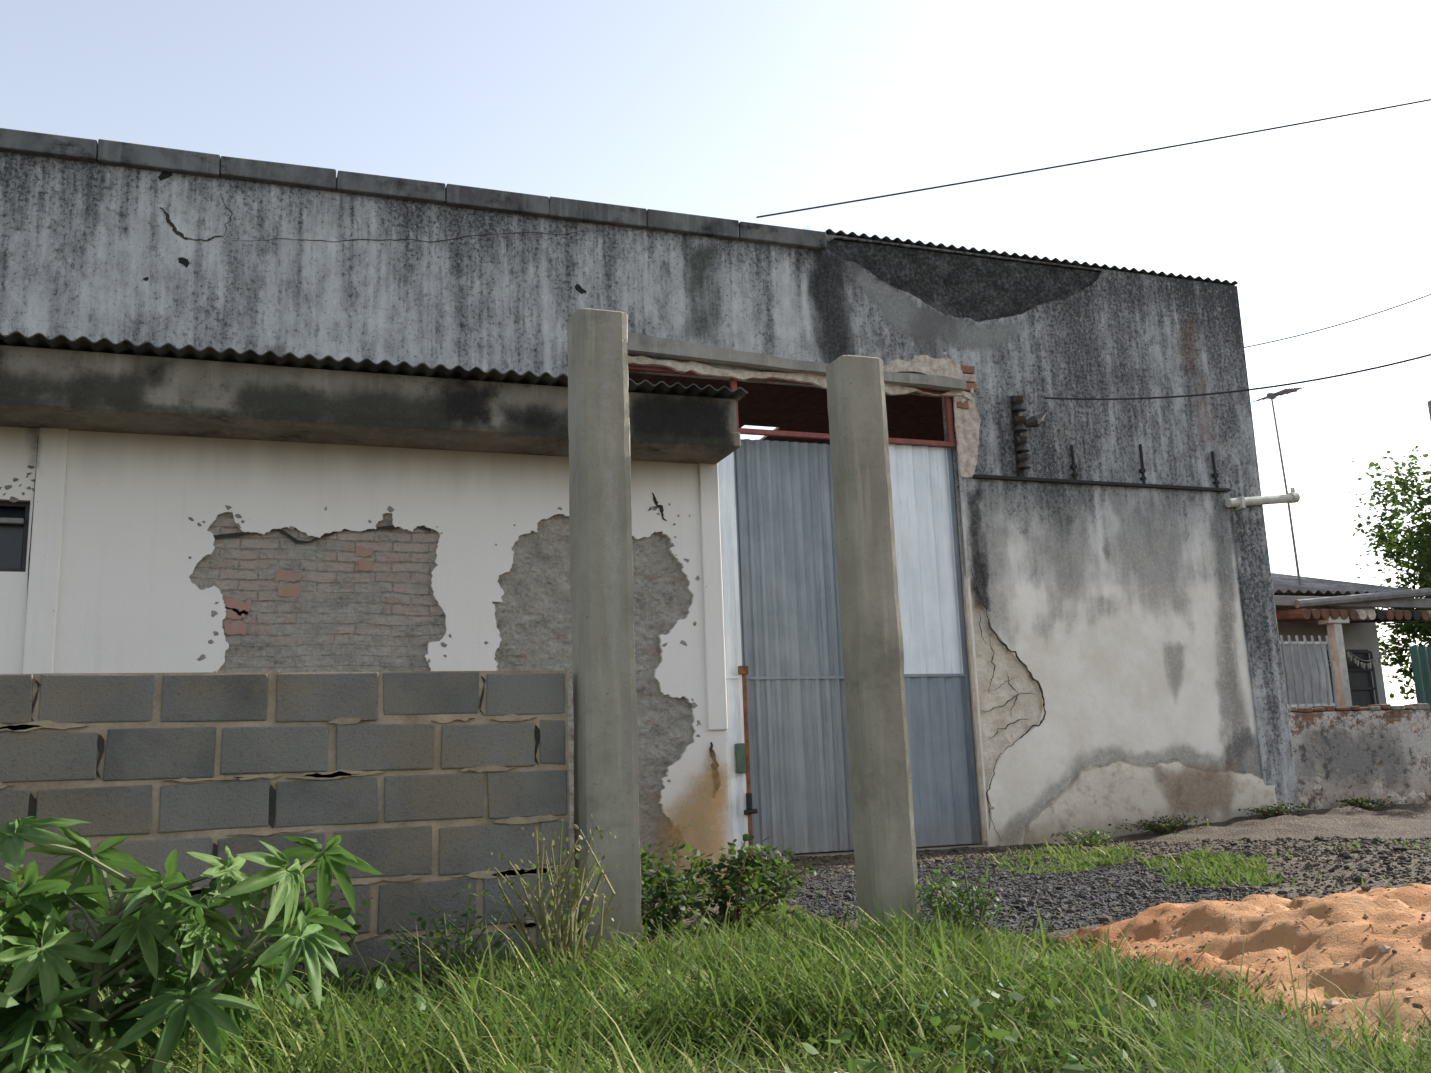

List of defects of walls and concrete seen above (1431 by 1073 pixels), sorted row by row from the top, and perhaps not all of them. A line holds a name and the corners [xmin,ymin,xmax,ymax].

crack [160,193,641,242]
damp [689,248,719,332]
damp [809,249,853,363]
spalling [827,239,1100,322]
damp [0,351,569,442]
damp [630,394,733,452]
spalling [628,355,827,390]
spalling [883,352,981,478]
spalling [188,505,452,672]
damp [969,491,989,609]
spalling [484,507,575,890]
spalling [632,503,701,901]